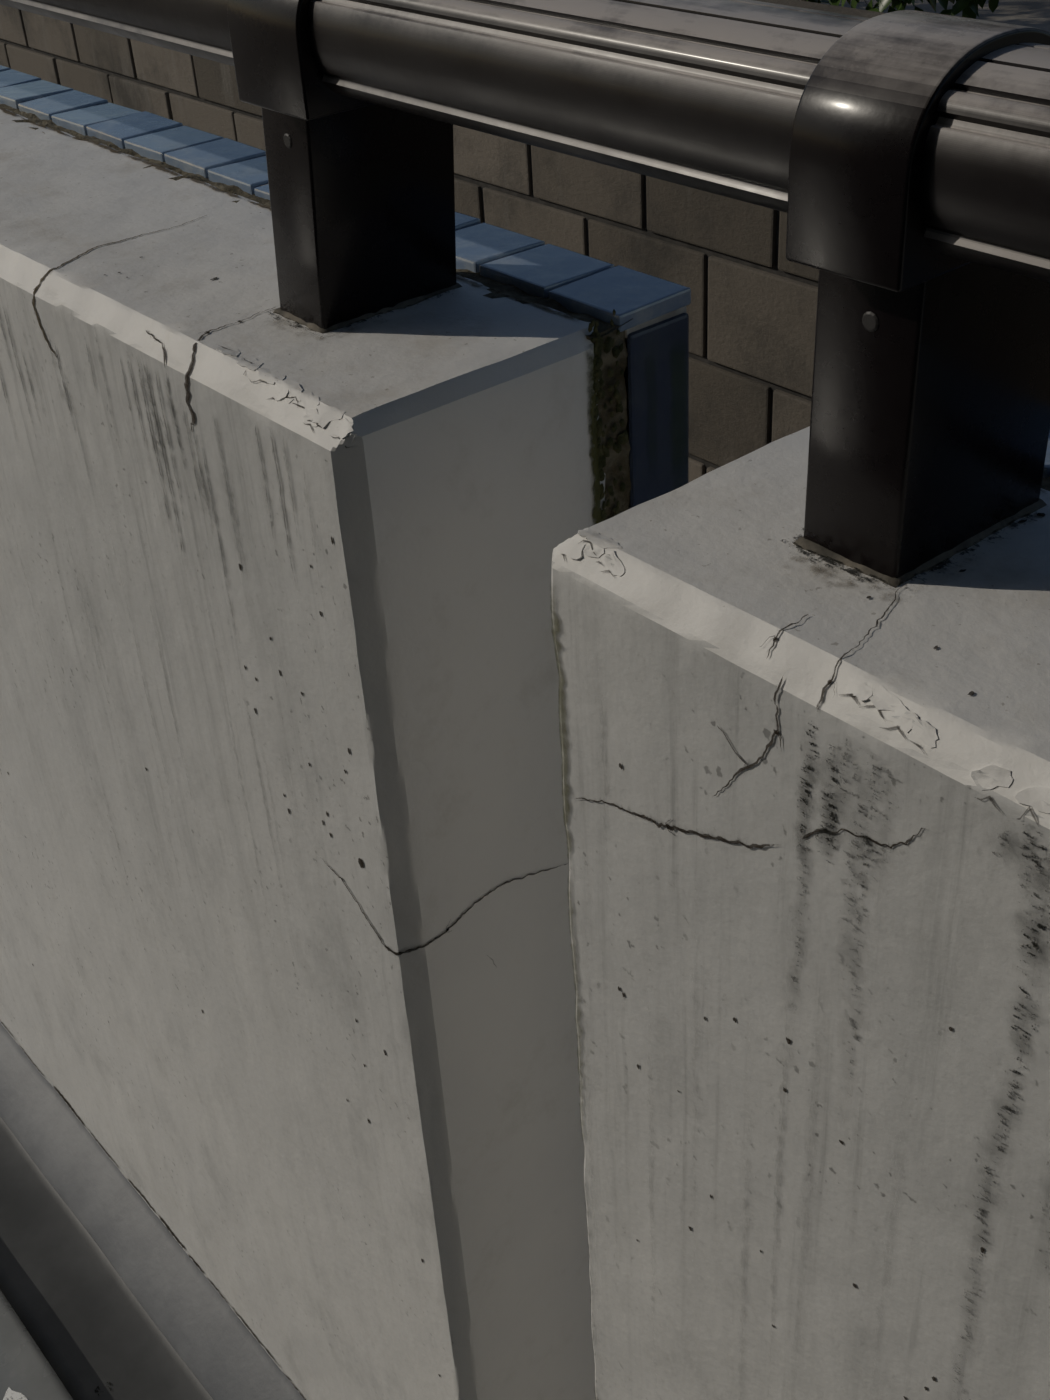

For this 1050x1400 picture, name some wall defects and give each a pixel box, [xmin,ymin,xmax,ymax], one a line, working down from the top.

crack [32,216,204,357]
crack [146,308,273,431]
peeling [217,346,354,448]
crack [714,614,808,796]
crack [817,585,904,709]
peeling [844,679,939,753]
crack [576,798,926,849]
water stain [797,721,841,896]
water stain [858,765,882,865]
peeling [971,765,1050,825]
crack [323,860,566,955]
water stain [993,824,1050,1152]